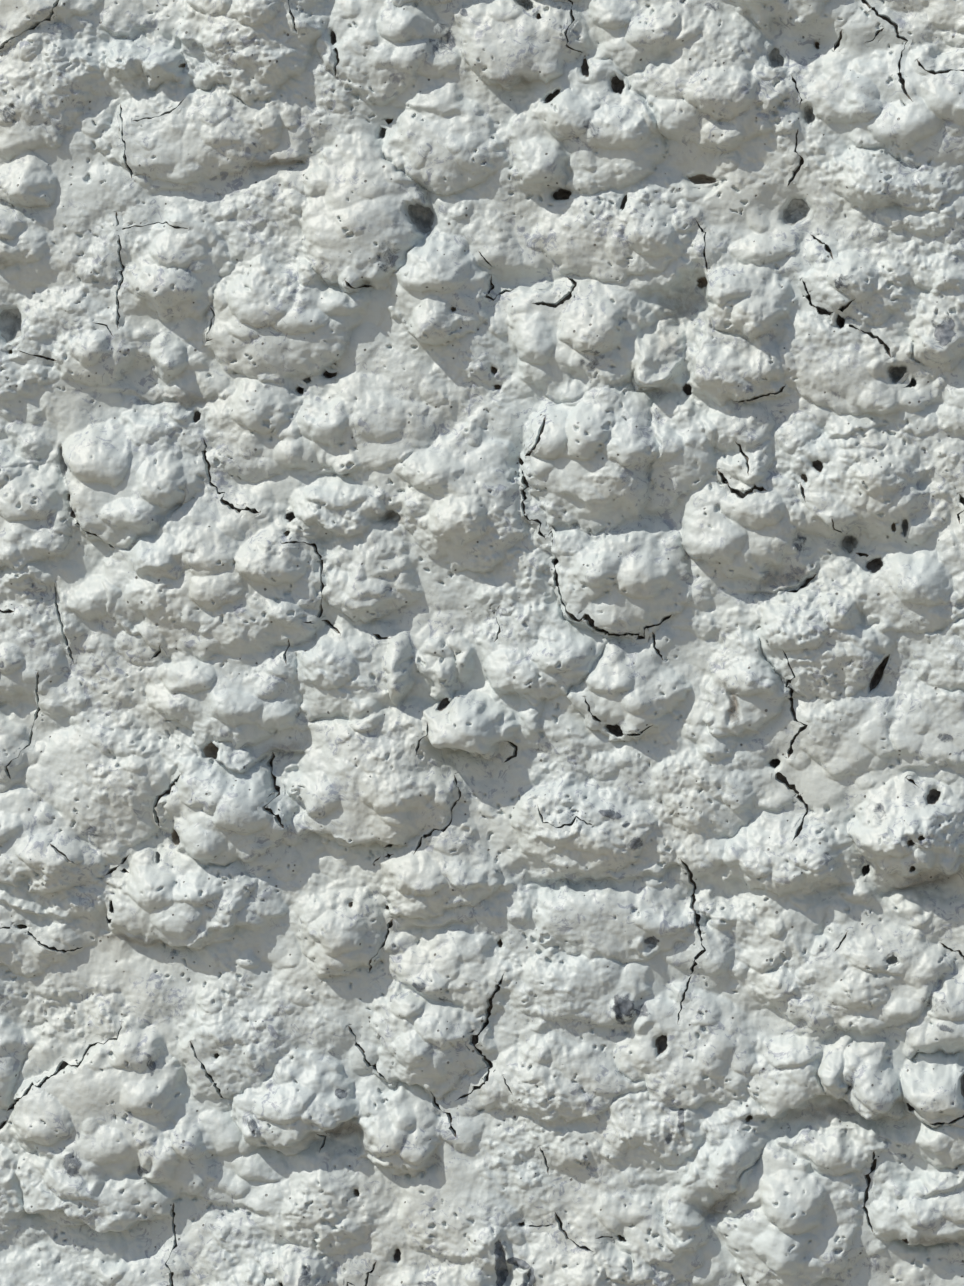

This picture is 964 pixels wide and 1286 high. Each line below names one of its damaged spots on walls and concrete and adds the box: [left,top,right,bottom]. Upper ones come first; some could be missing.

crack [830,0,964,104]
crack [92,211,189,339]
crack [798,231,895,359]
crack [197,438,261,519]
crack [279,536,392,665]
crack [516,415,675,663]
crack [257,751,290,830]
crack [771,649,813,845]
crack [673,858,711,1025]
crack [0,1021,126,1149]
crack [427,970,516,1139]
crack [857,1151,881,1234]